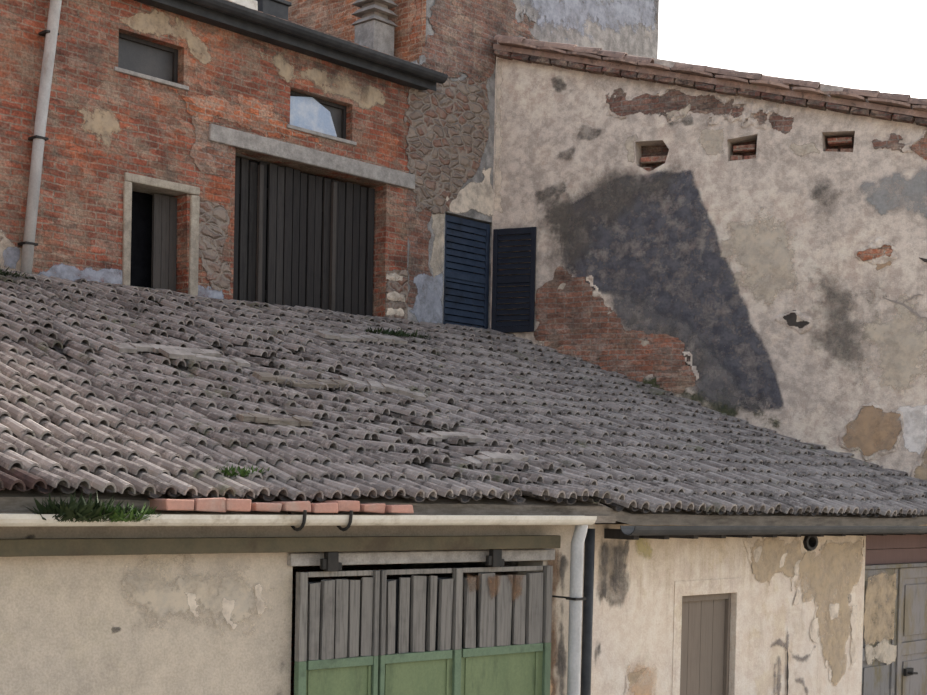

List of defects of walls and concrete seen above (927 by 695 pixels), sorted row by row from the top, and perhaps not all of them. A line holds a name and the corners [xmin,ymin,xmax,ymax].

flaking render [409,0,539,81]
flaking render [553,78,566,92]
flaking render [603,84,794,155]
flaking render [536,183,565,200]
spalling [855,237,898,270]
spalling [534,266,699,395]
spalling [775,310,814,334]
flaking render [820,284,857,361]
spalling [838,402,904,461]
leakage [600,538,652,604]
peeling [742,536,897,686]